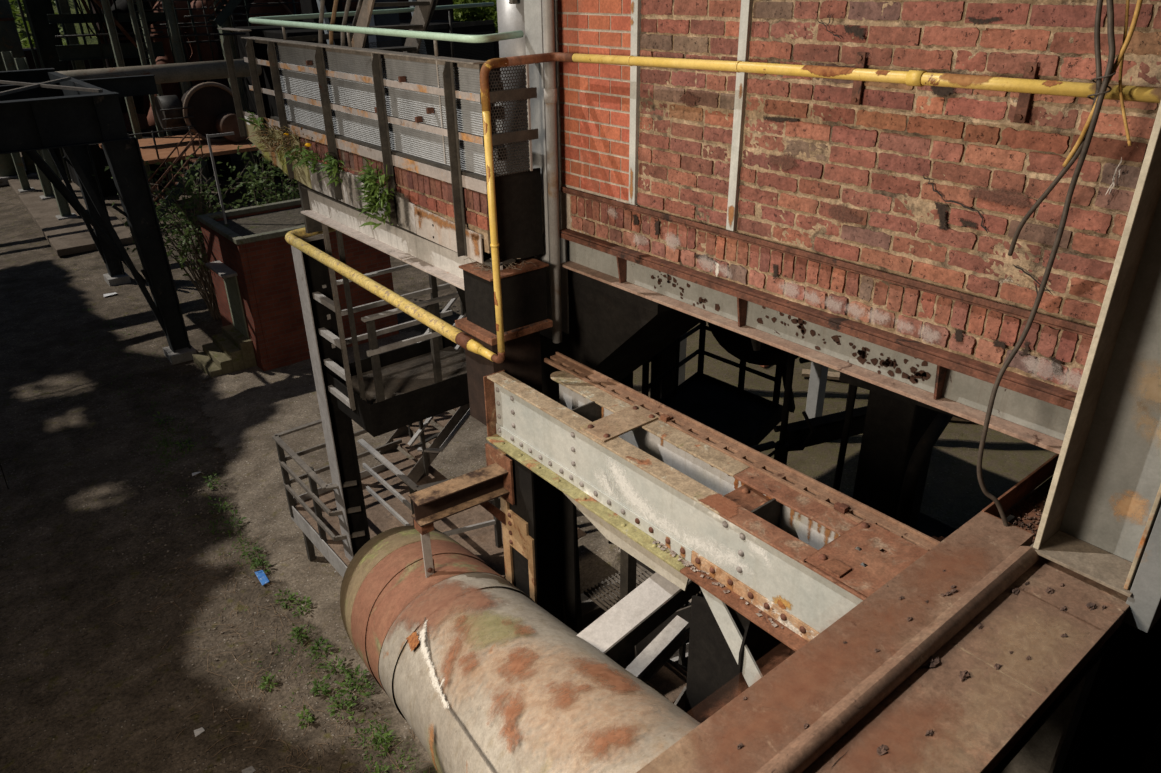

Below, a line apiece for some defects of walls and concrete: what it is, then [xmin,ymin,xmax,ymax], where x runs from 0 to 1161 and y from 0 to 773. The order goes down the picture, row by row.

damp [700,257,731,277]
damp [782,284,937,342]
damp [1026,358,1081,387]
rust [698,479,744,518]
rust [789,509,839,547]
rust [652,537,783,628]
rust [772,595,791,610]
peeling [389,580,494,708]
rust [442,615,477,686]
rust [487,621,537,751]
rust [547,659,640,707]